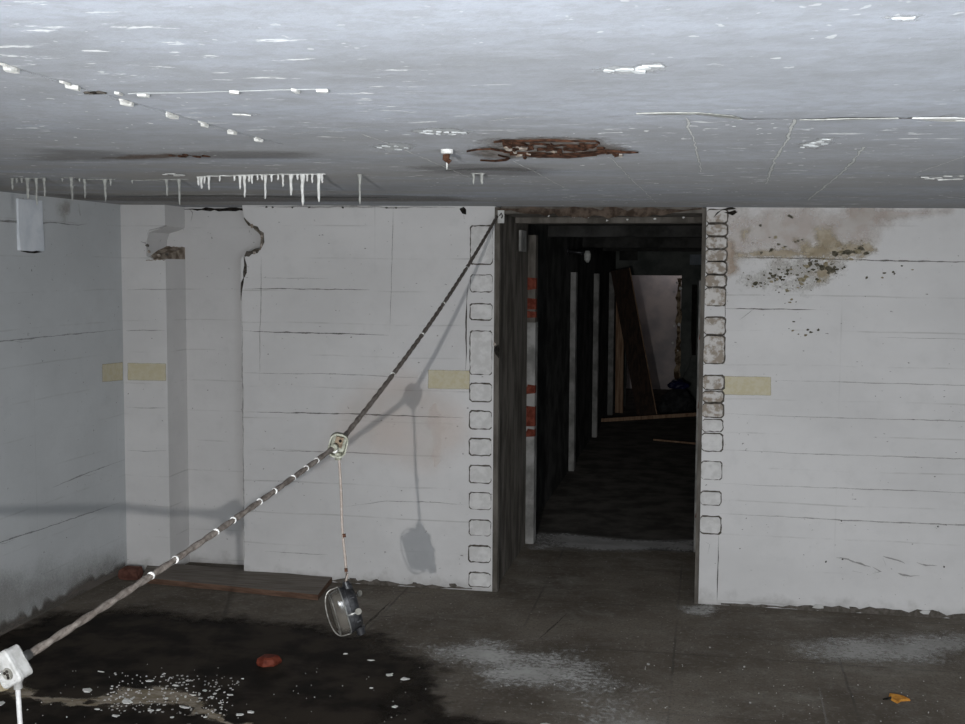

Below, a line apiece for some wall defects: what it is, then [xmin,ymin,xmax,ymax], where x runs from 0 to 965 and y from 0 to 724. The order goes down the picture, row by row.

crack [616,112,748,172]
crack [765,114,965,184]
crack [241,257,364,298]
damp [726,229,874,304]
damp [0,564,126,636]